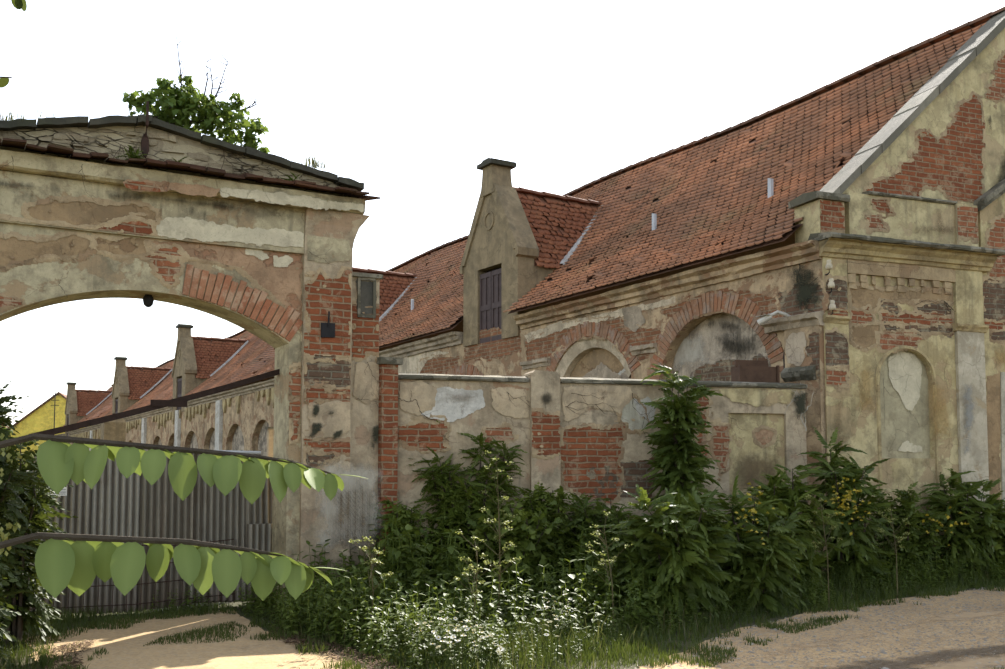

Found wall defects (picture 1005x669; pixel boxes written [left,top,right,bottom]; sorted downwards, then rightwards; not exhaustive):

flaking render [863,50,1005,346]
flaking render [0,179,379,468]
crack [565,392,653,437]
flaking render [398,272,955,506]
leakage [675,339,703,367]
leakage [719,337,754,355]